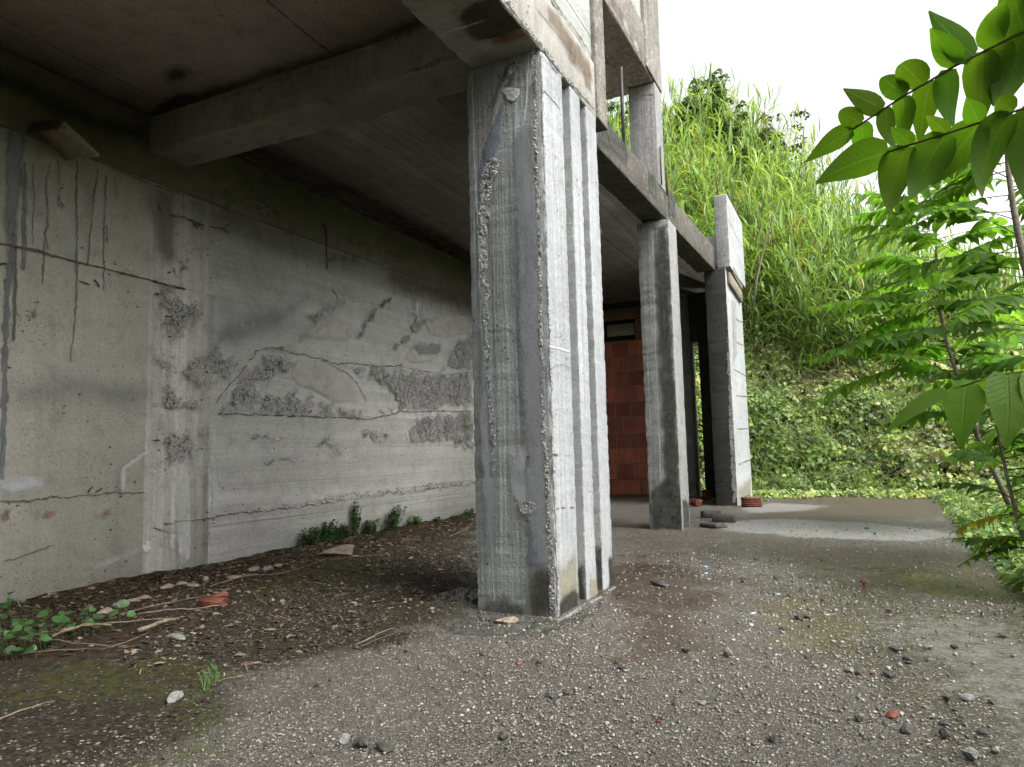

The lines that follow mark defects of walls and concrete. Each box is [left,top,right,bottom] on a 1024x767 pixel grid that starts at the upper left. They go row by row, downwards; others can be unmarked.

leakage [460,0,527,43]
crack [0,243,186,290]
leakage [0,131,117,489]
crack [154,67,526,590]
crack [3,491,144,503]